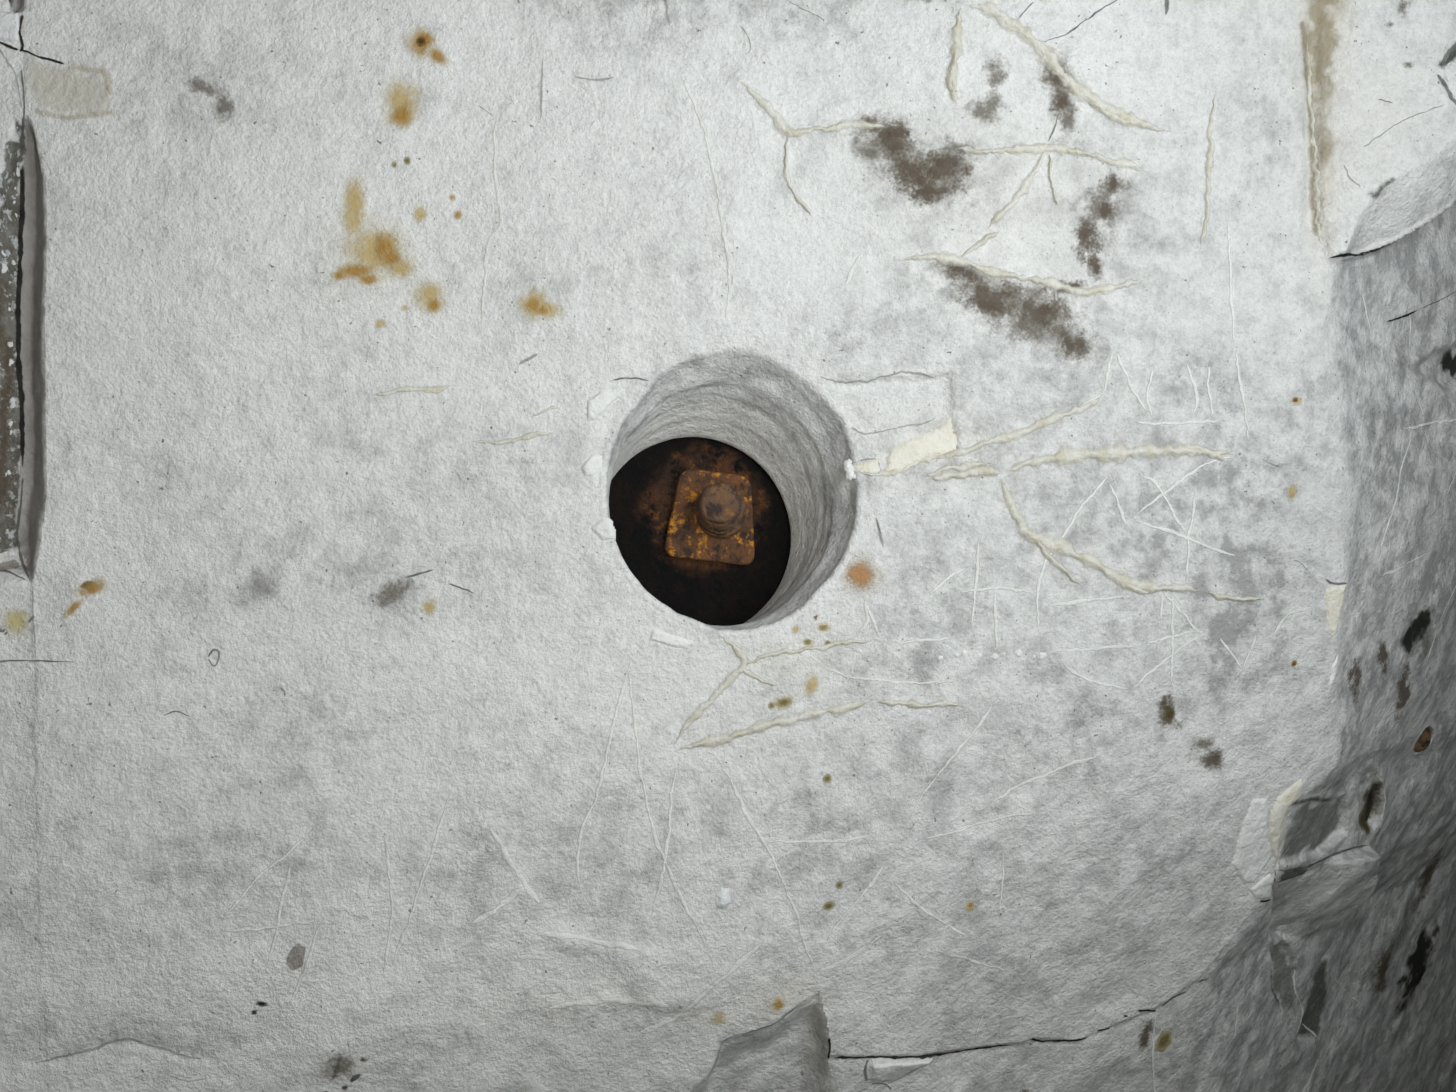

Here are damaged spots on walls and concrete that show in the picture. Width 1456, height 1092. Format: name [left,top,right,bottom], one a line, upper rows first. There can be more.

corrosion [410,31,445,63]
crack [1019,0,1117,42]
corrosion [389,85,414,124]
water stain [859,118,973,203]
water stain [1301,0,1336,233]
corrosion [335,183,411,284]
water stain [947,174,1123,359]
spalling [0,120,47,580]
water stain [1378,610,1431,722]
peeling [1231,798,1274,900]
crack [827,979,1208,1089]
spalling [1271,947,1327,1035]